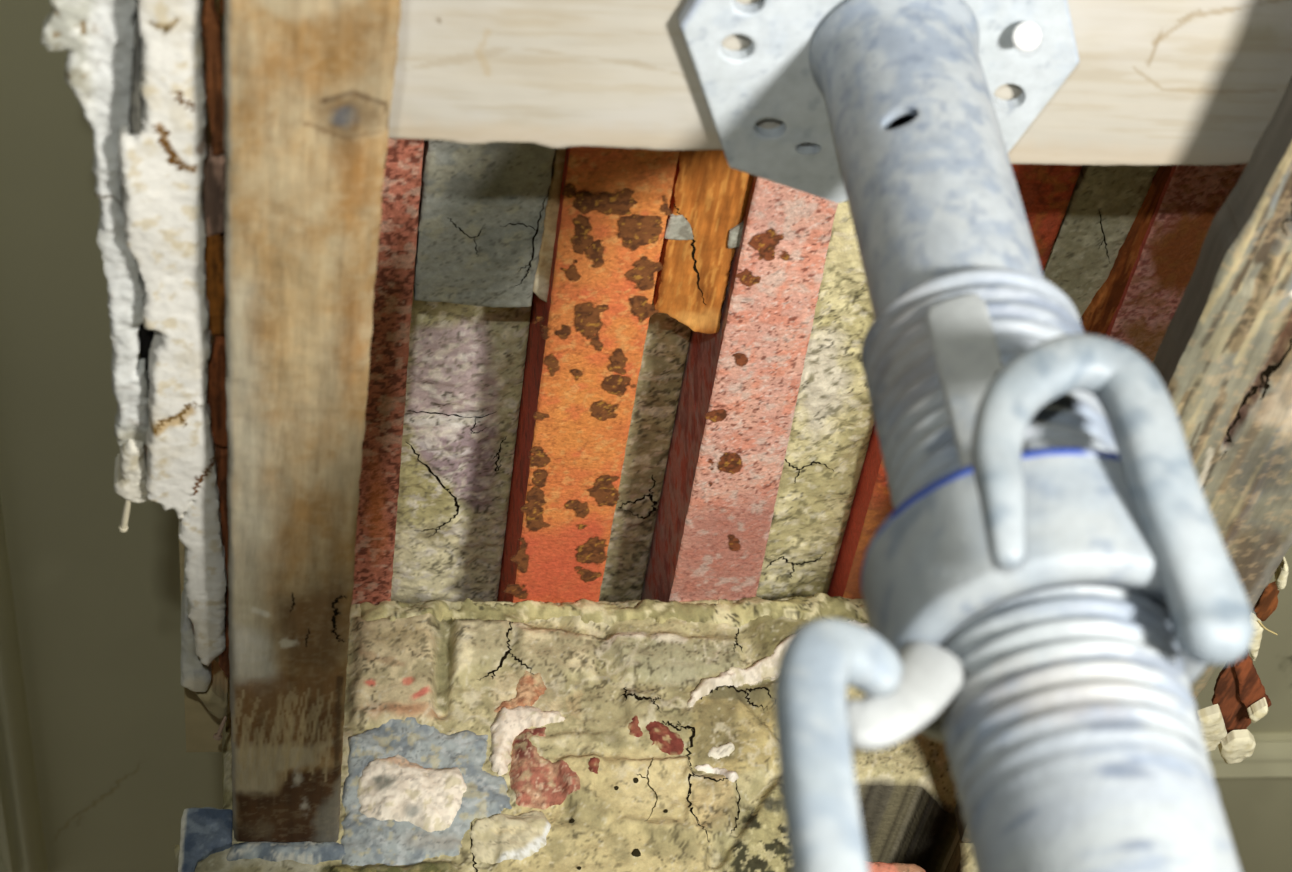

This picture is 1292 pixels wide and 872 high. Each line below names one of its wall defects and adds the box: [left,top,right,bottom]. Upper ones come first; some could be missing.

crack [447,186,550,286]
corrosion [560,184,672,323]
corrosion [736,228,790,287]
spalling [41,0,227,666]
corrosion [535,302,636,421]
corrosion [708,452,743,486]
corrosion [565,475,620,582]
crack [480,622,533,680]
spalling [494,670,547,713]
spalling [509,727,600,810]
spalling [628,715,684,755]
crack [621,685,775,842]